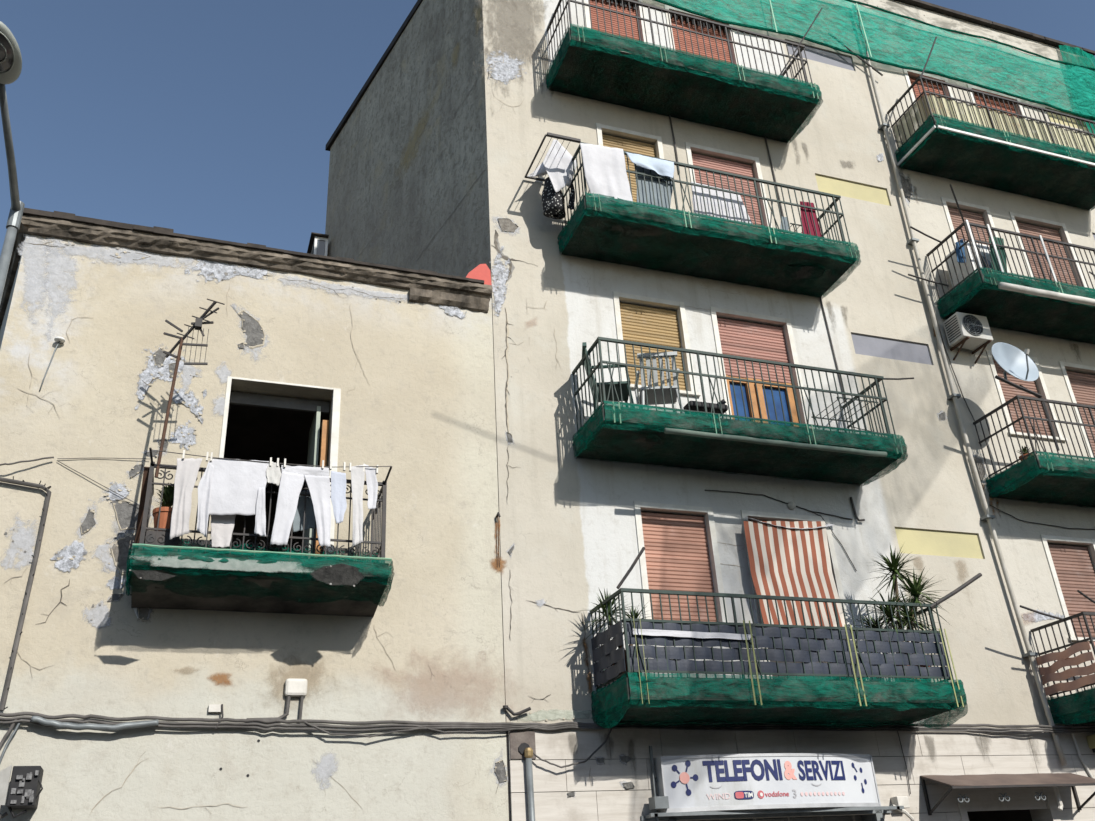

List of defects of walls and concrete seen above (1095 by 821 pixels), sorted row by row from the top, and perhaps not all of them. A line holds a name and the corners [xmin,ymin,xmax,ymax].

peeling [487,49,527,84]
flaking render [232,304,269,360]
peeling [50,346,364,628]
peeling [1,517,36,569]
rust [492,520,505,571]